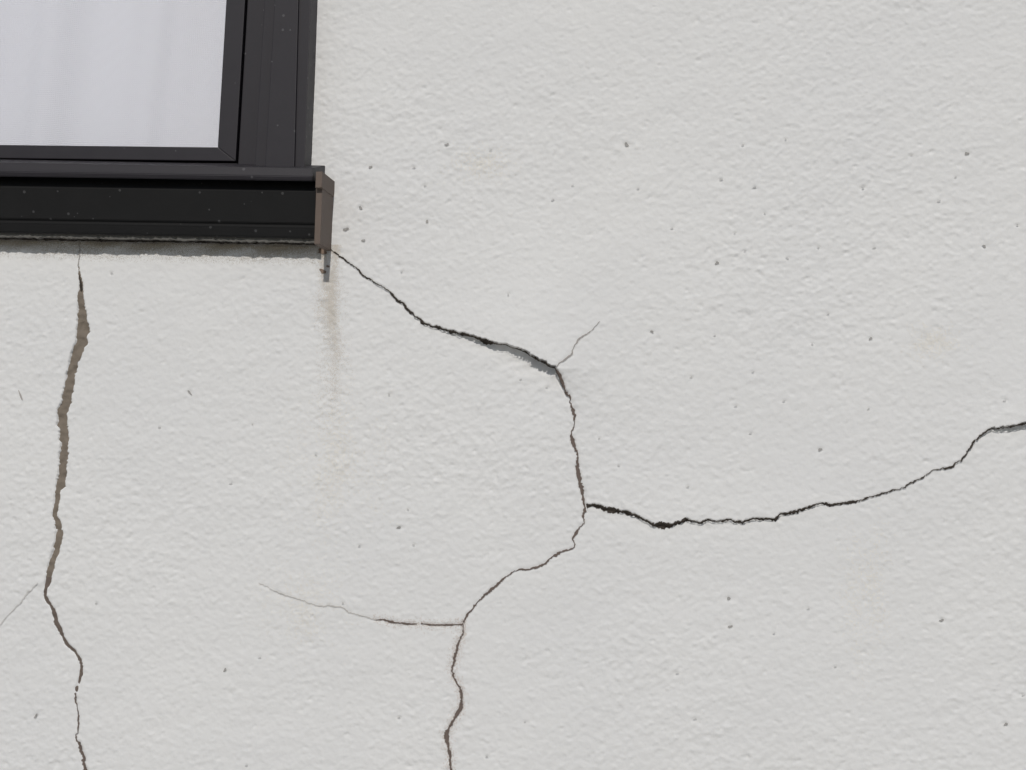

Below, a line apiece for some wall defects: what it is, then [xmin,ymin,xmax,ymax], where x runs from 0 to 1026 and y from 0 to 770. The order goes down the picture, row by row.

crack [0,243,90,770]
crack [259,249,1026,770]